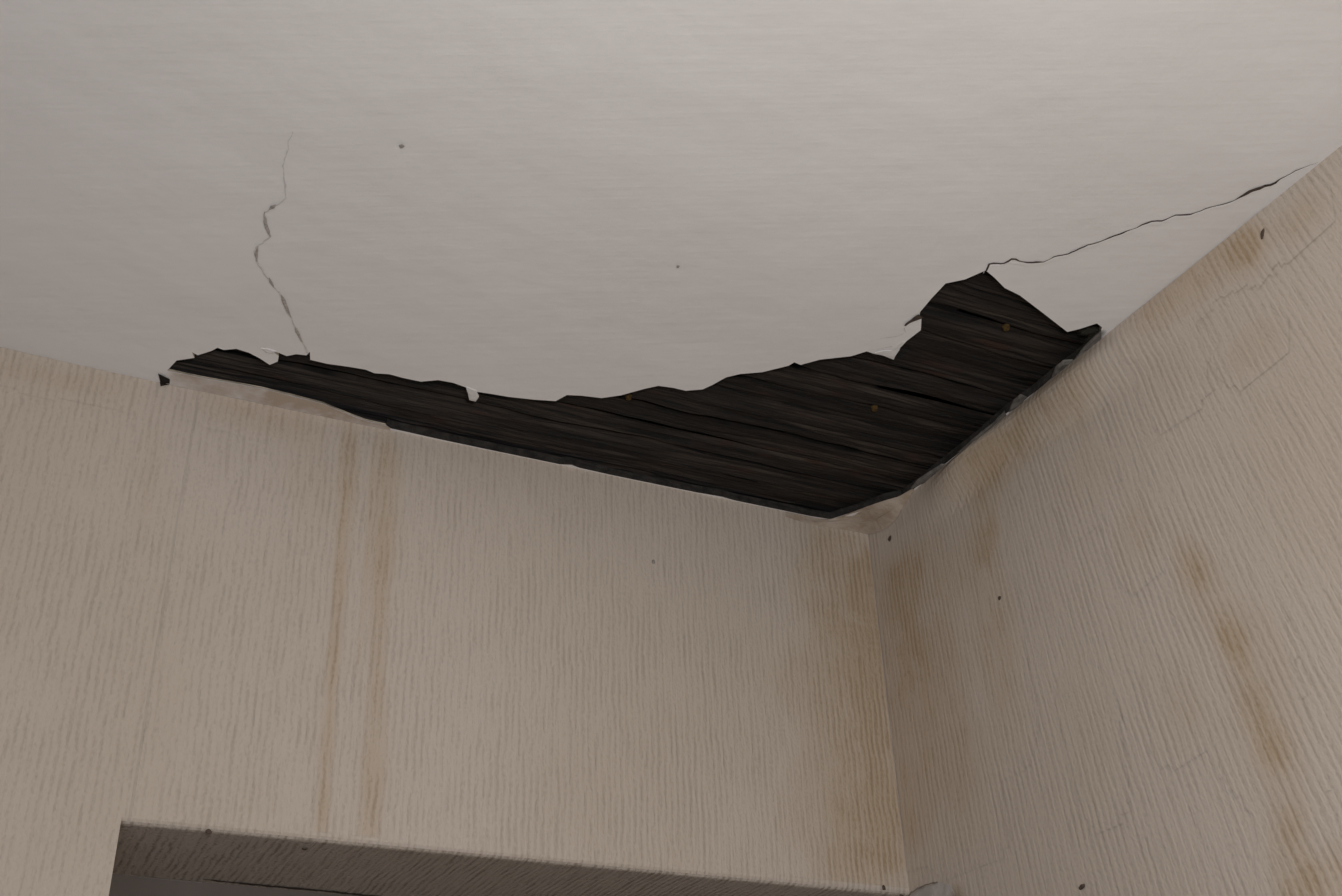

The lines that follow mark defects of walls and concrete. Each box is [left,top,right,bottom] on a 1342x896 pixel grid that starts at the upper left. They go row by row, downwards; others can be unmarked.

crack [254,132,309,353]
crack [984,164,1313,271]
flaking render [466,386,479,402]
flaking render [875,342,905,360]
flaking render [910,464,945,489]
leakage [755,178,1342,896]
leakage [0,347,408,838]